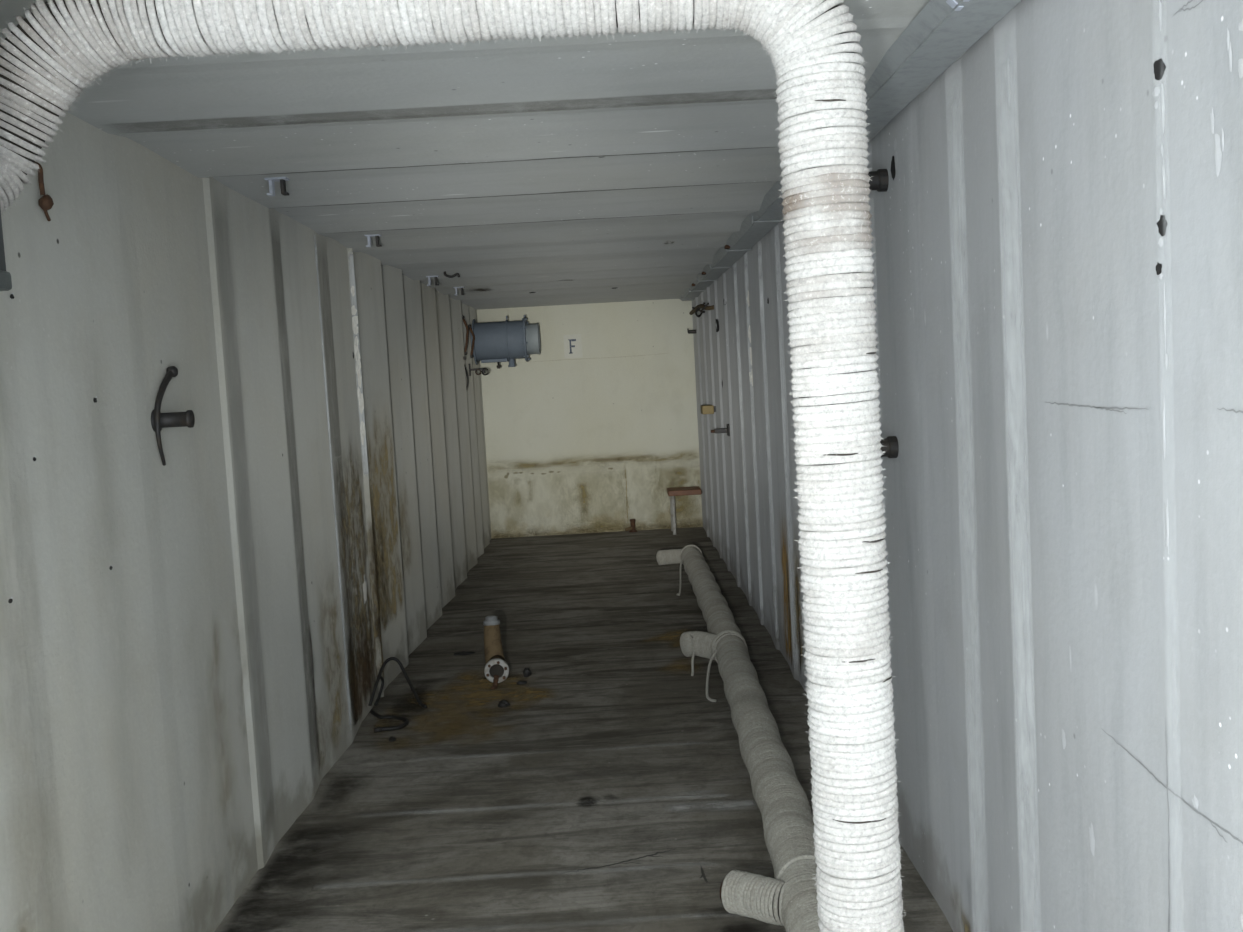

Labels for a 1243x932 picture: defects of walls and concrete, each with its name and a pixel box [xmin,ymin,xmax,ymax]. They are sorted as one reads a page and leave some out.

crack [1173,0,1203,16]
crack [1047,402,1148,414]
crack [1101,718,1243,932]